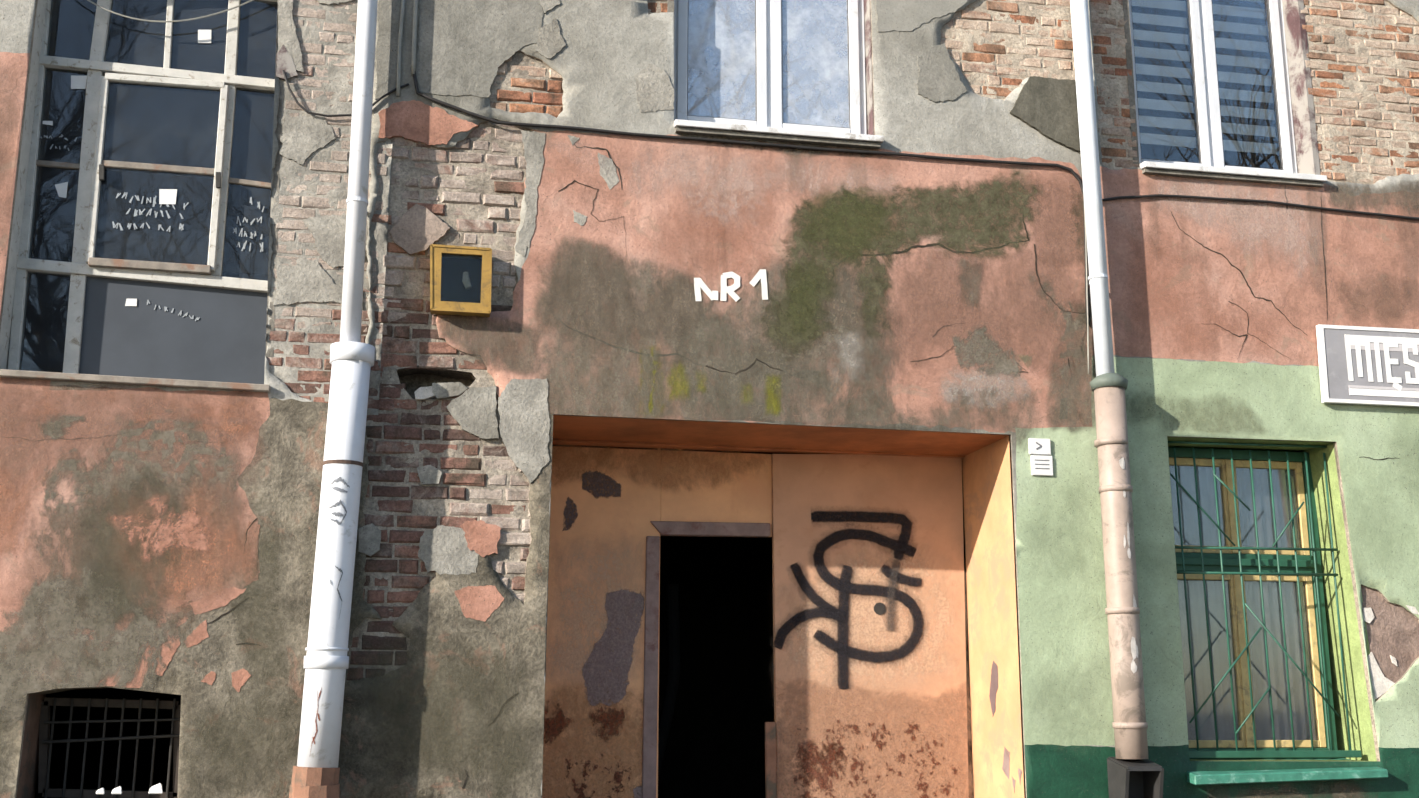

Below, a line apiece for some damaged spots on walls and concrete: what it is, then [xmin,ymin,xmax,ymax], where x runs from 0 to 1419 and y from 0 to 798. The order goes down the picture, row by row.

flaking render [266,0,358,403]
flaking render [346,0,566,681]
peeling [597,153,619,189]
damp [440,180,1082,442]
flaking render [940,0,1075,100]
flaking render [1090,0,1139,170]
crack [1171,186,1328,358]
flaking render [1301,0,1419,185]
damp [0,389,276,663]
flaking render [1361,585,1419,700]
corrosion [544,702,642,798]
corrosion [791,714,959,798]